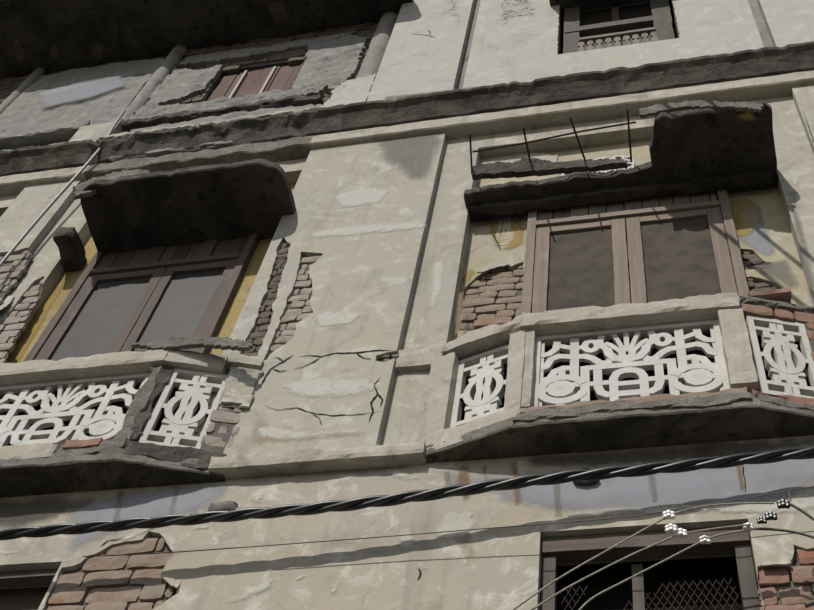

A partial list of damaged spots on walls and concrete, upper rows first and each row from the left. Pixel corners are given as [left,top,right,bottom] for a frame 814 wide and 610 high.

peeling [496,218,514,250]
peeling [739,208,793,292]
flaking render [0,248,44,363]
flaking render [242,241,321,359]
flaking render [459,261,524,331]
flaking render [740,303,814,324]
crack [260,350,386,386]
crack [267,379,383,424]
flaking render [47,535,182,610]
flaking render [757,548,814,610]